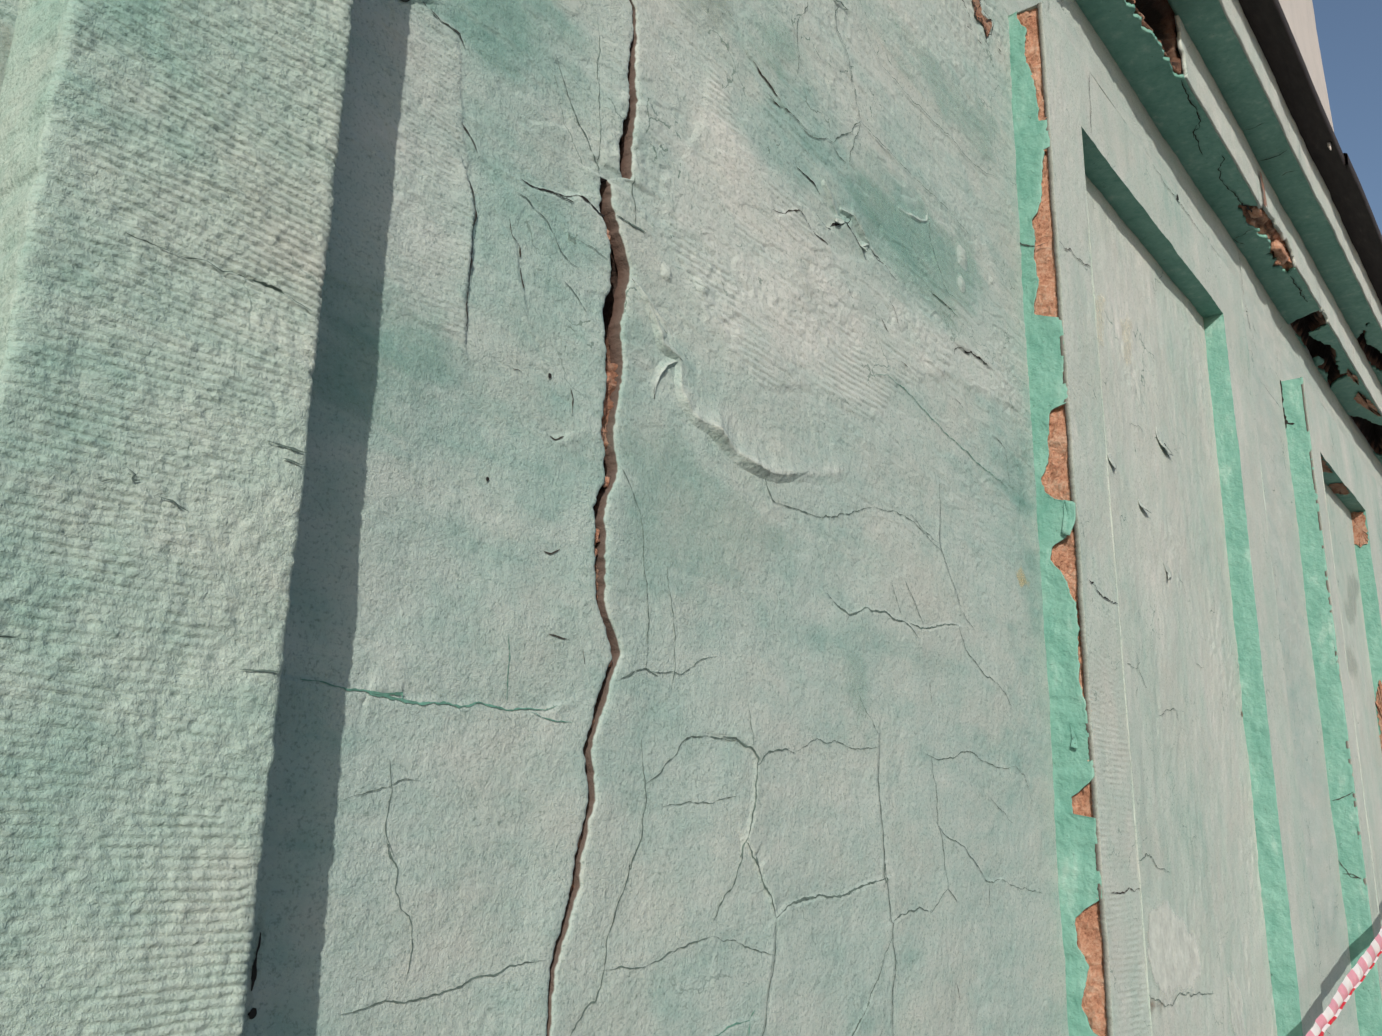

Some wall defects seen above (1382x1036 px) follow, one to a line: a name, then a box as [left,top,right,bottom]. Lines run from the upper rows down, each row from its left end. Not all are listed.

spalling [1017,8,1047,121]
spalling [1126,0,1182,74]
spalling [1032,149,1058,317]
spalling [1238,205,1293,271]
crack [462,29,717,690]
spalling [1290,310,1382,454]
crack [765,478,1011,705]
spalling [1041,404,1092,711]
crack [241,639,595,728]
crack [341,766,543,1015]
crack [571,693,1041,1036]
spalling [1075,898,1117,1036]